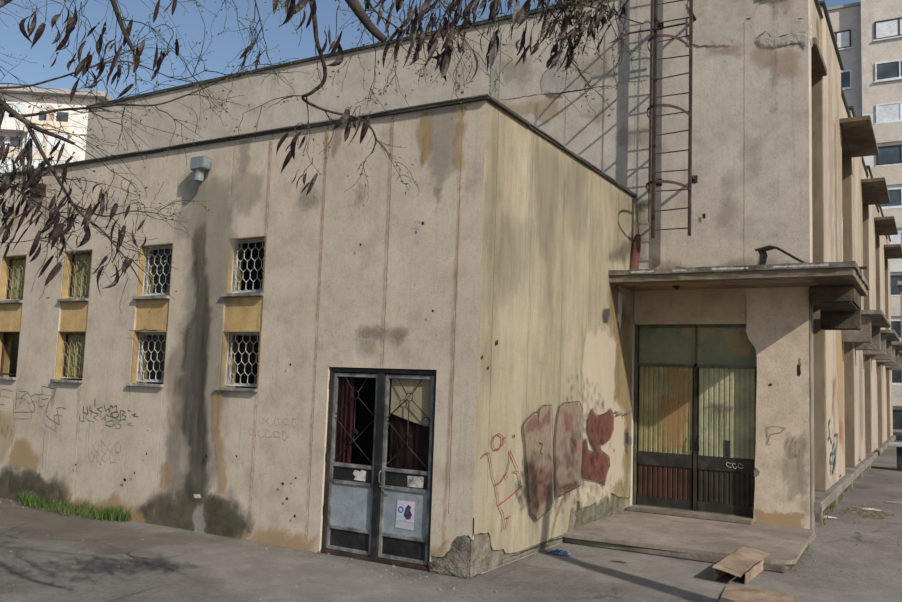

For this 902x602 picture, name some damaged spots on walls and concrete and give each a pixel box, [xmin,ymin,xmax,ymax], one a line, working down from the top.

spalling [687,0,760,46]
spalling [540,57,596,99]
leakage [137,183,250,540]
peeling [574,308,632,528]
leakage [0,467,67,506]
spalling [429,533,564,579]